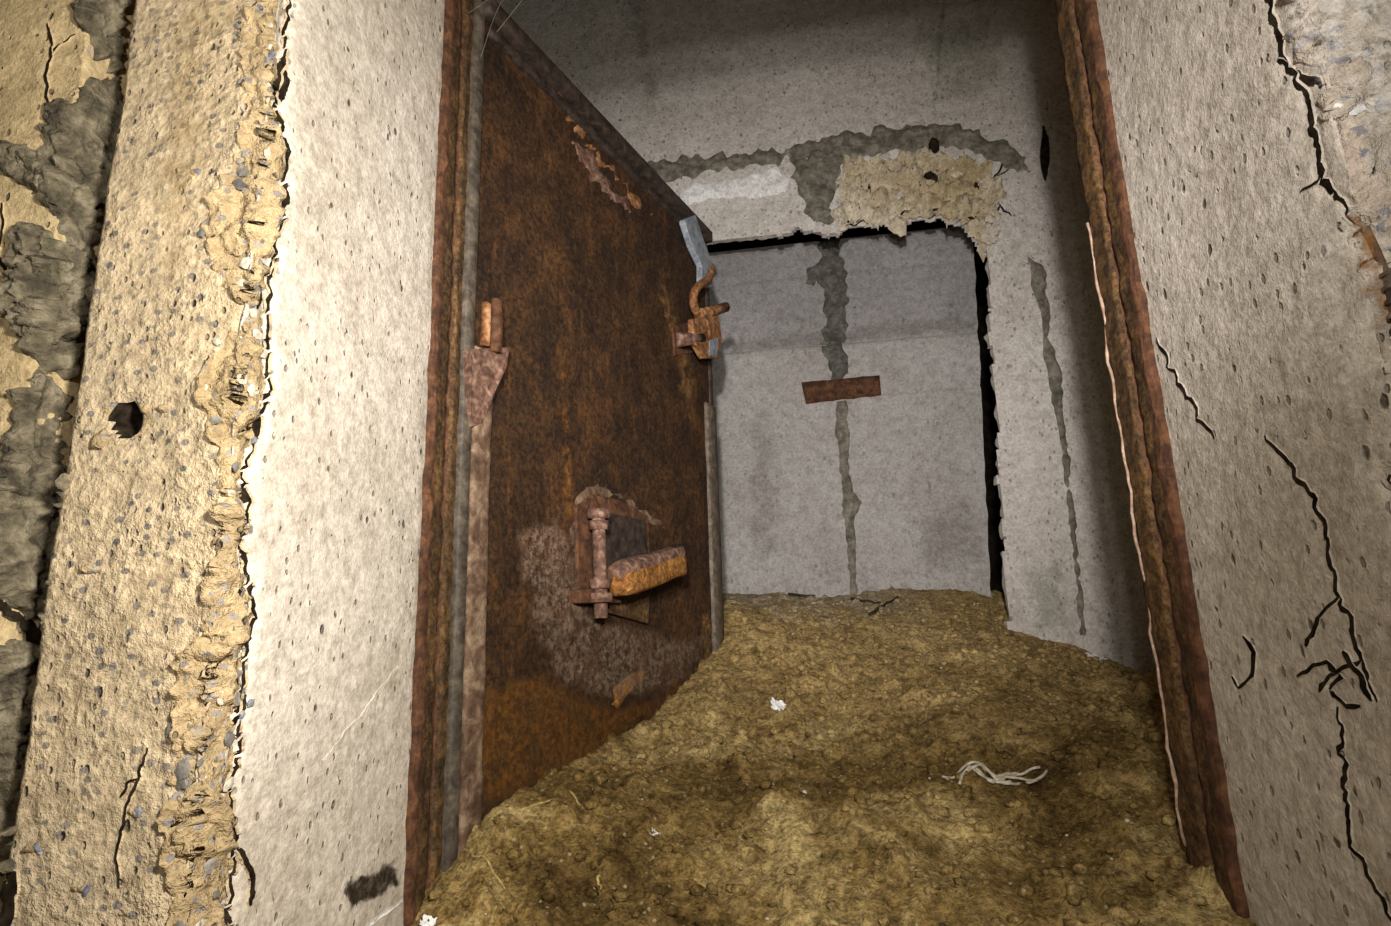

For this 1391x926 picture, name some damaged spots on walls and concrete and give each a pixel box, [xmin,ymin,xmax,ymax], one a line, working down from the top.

peeling [680,164,789,205]
spalling [830,137,1007,262]
crack [1264,0,1365,238]
crack [1156,338,1216,439]
spalling [127,0,290,926]
crack [1231,634,1258,690]
crack [1264,435,1391,921]
crack [114,748,151,889]